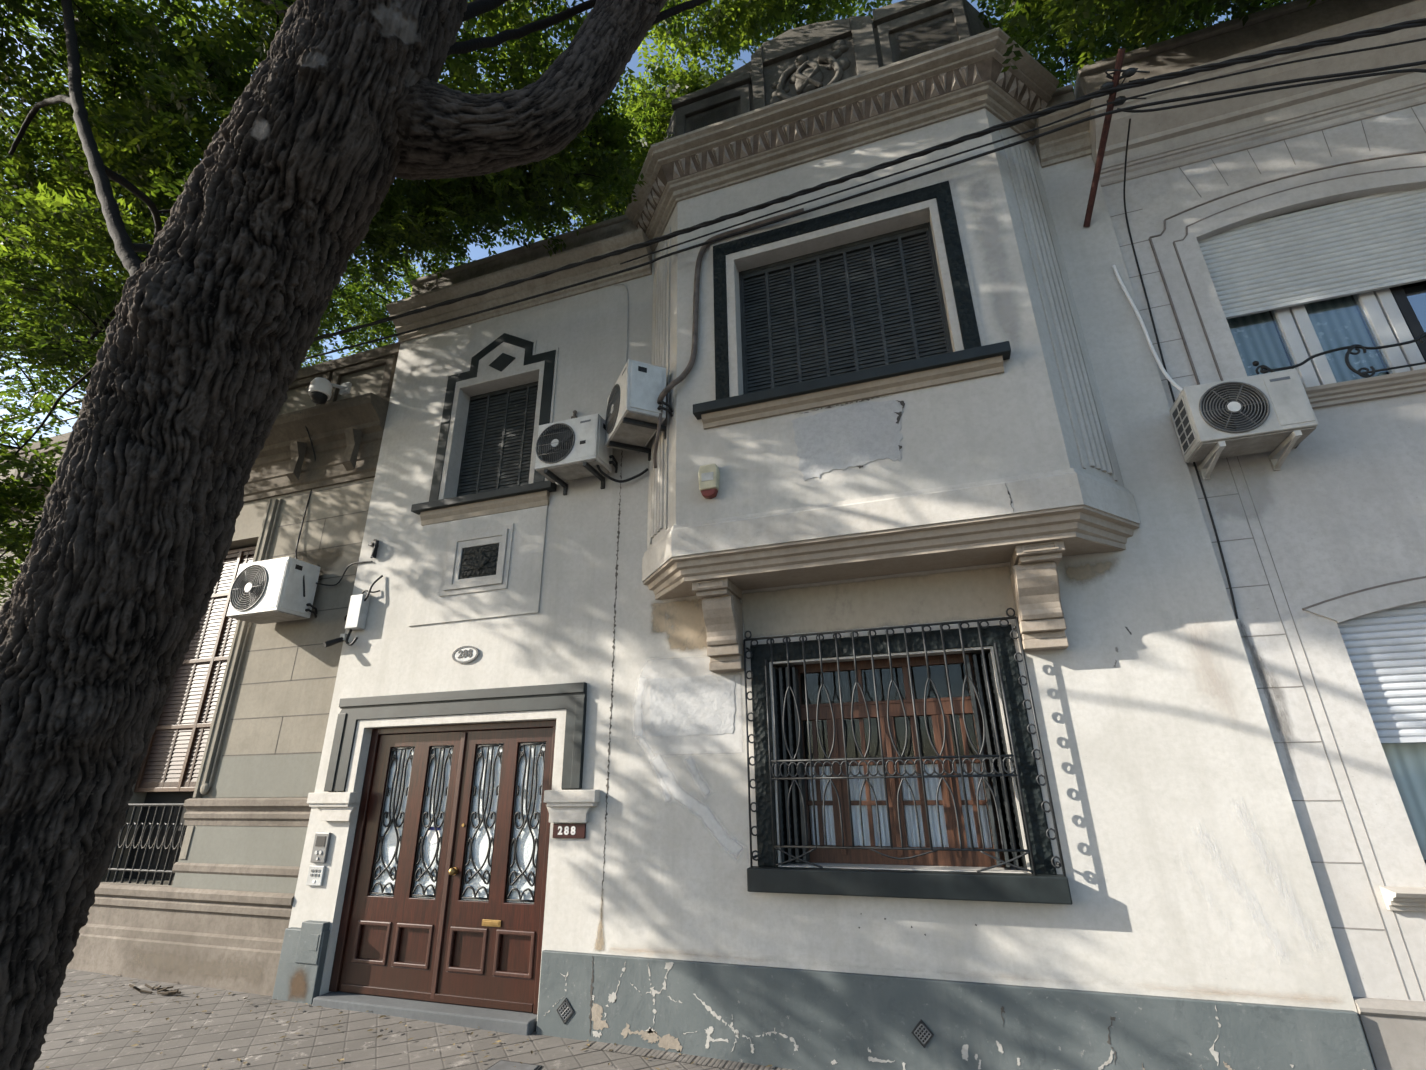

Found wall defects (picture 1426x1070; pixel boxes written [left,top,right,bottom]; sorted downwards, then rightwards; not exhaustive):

crack [601,450,623,909]
spalling [591,995,682,1052]
peeling [961,1044,982,1069]